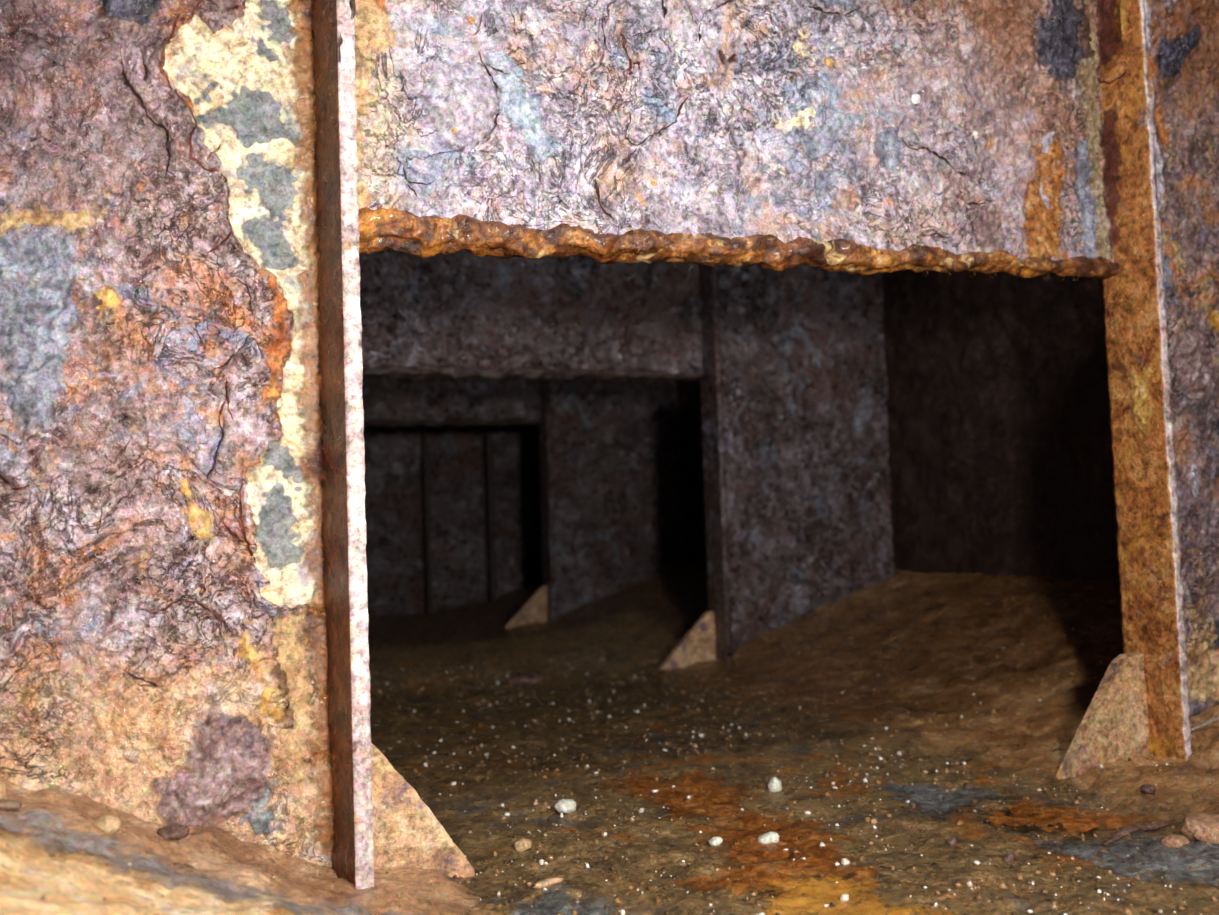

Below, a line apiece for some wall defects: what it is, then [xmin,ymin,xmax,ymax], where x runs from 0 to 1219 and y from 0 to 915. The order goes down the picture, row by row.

crack [602,0,667,78]
corrosion [1097,0,1127,65]
crack [120,0,245,253]
crack [470,51,506,148]
crack [625,96,689,164]
crack [900,137,995,238]
corrosion [1024,131,1068,259]
corrosion [1100,108,1121,248]
crack [207,278,253,480]
peeling [162,0,319,791]
corrosion [1132,367,1157,434]
crack [224,480,256,564]